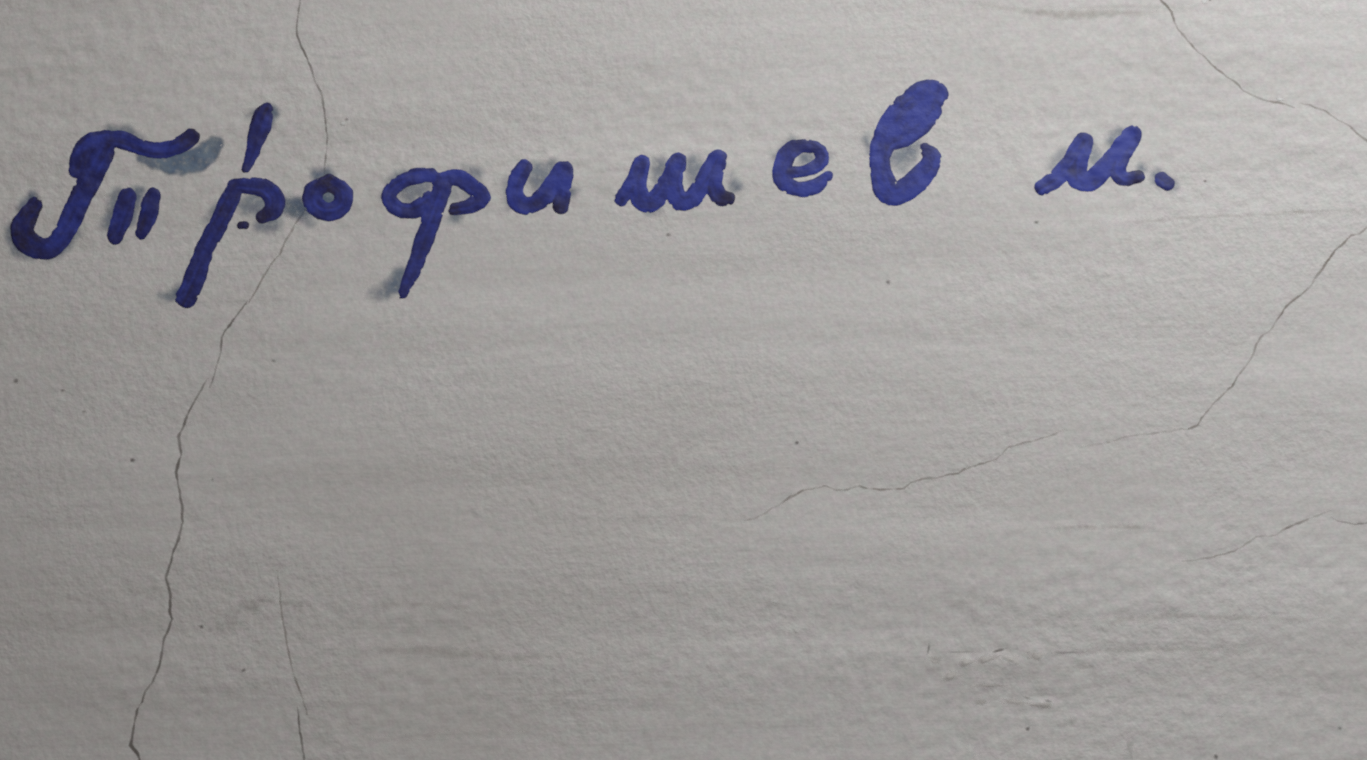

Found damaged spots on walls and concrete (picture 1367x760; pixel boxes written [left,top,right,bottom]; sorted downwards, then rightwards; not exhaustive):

crack [129,700,143,760]